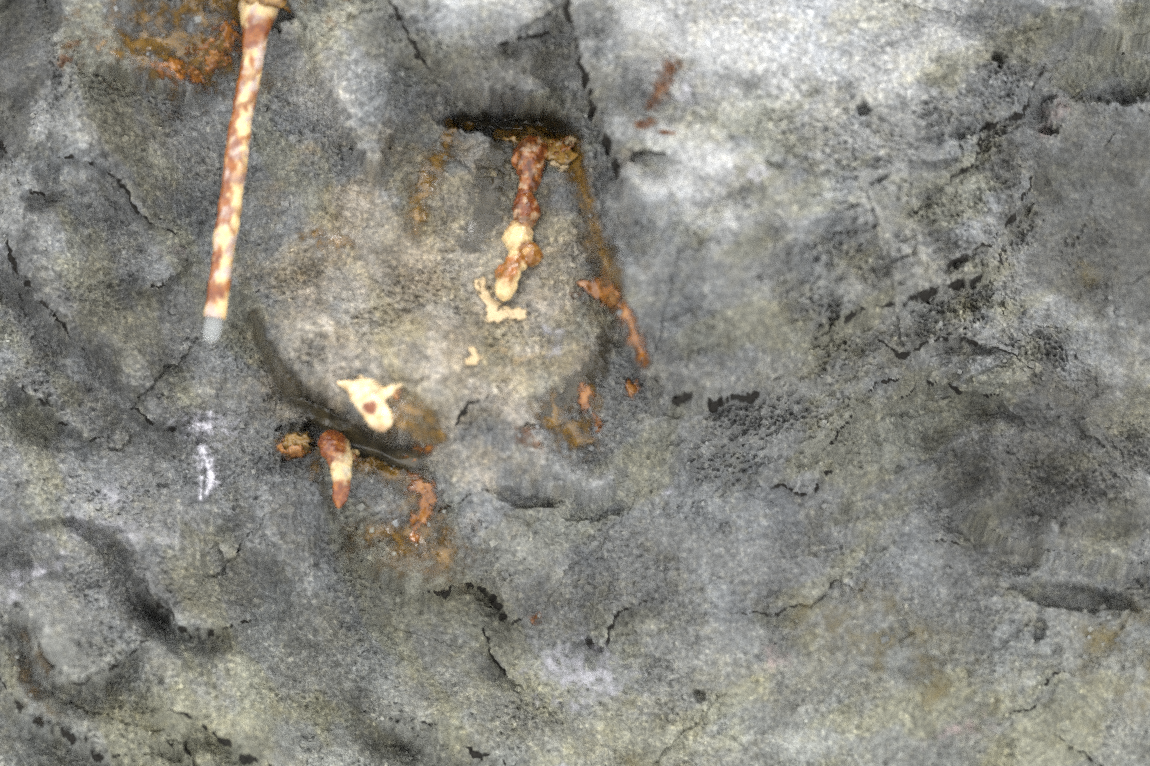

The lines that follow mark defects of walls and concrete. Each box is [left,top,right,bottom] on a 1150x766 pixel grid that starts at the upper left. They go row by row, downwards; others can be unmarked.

corrosion [92,0,242,99]
corrosion [564,163,649,367]
corrosion [536,382,603,449]
corrosion [626,379,640,398]
corrosion [364,389,456,577]